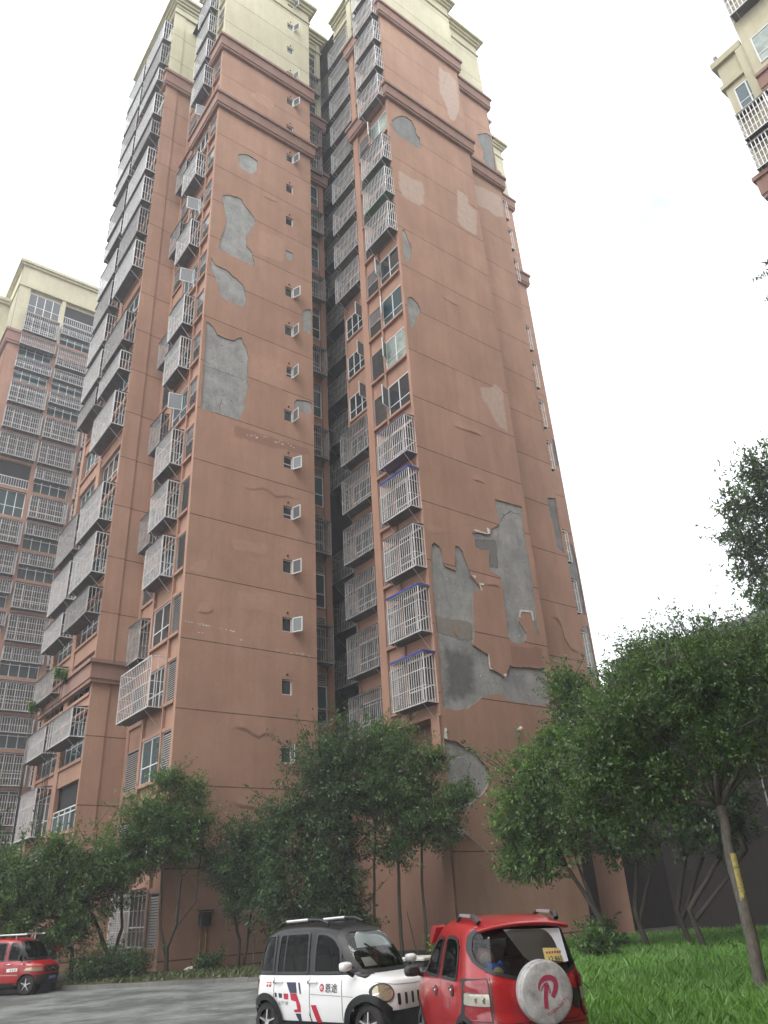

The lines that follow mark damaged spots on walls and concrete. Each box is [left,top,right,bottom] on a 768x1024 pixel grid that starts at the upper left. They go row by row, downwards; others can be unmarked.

spalling [238,154,257,174]
spalling [392,116,420,148]
spalling [477,133,496,171]
spalling [211,195,255,307]
spalling [201,322,249,420]
spalling [431,499,549,711]
spalling [443,728,490,812]